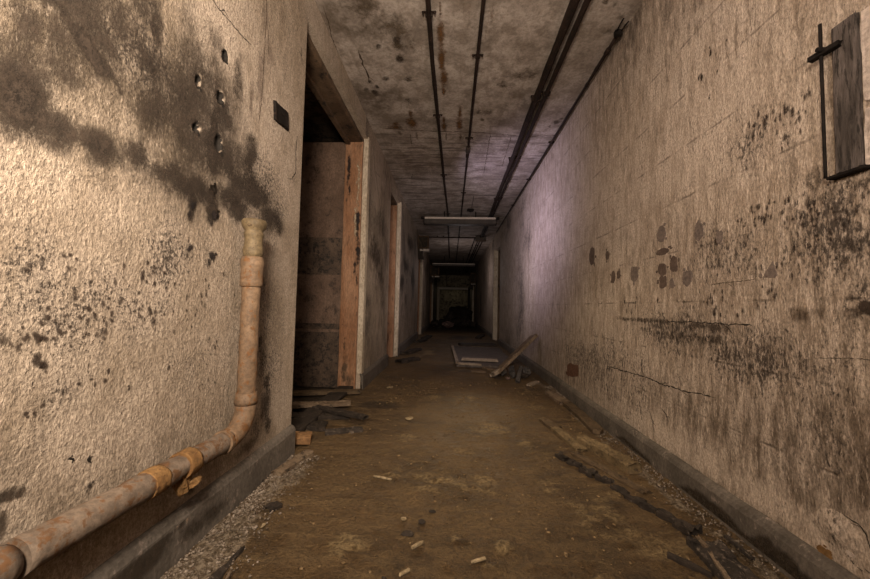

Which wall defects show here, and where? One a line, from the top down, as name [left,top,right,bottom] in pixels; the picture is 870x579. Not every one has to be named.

crack [213,0,269,119]
corrosion [437,23,448,95]
damp [0,0,282,235]
damp [749,104,806,150]
damp [737,168,860,275]
damp [0,280,113,372]
damp [121,261,176,330]
damp [616,290,744,344]
crack [668,321,755,333]
damp [847,300,870,317]
crack [608,366,715,398]
damp [681,487,810,579]